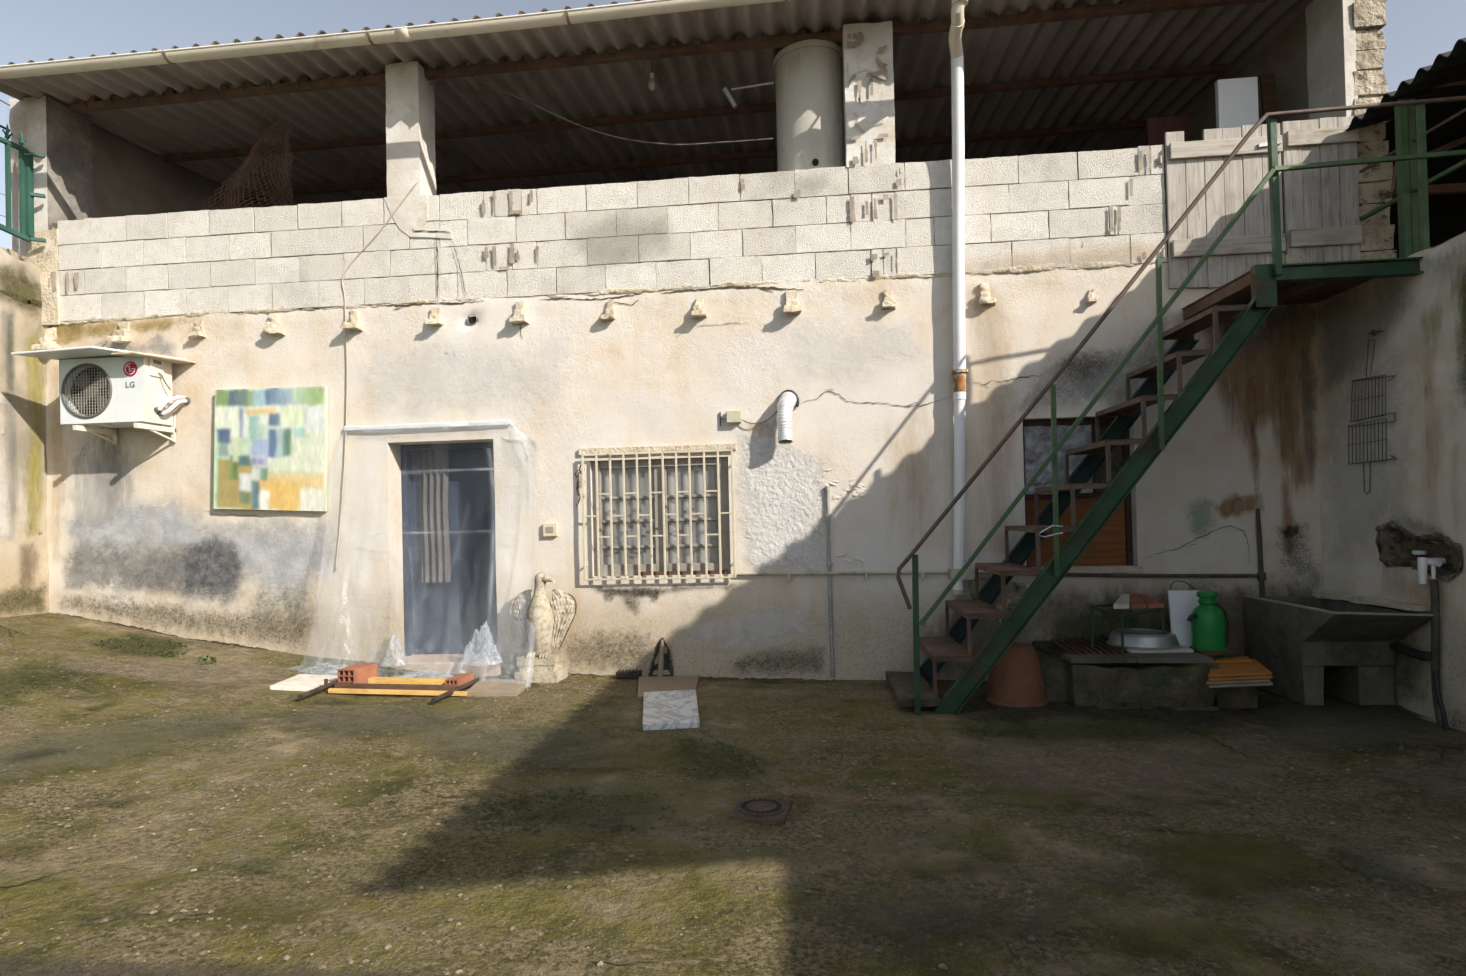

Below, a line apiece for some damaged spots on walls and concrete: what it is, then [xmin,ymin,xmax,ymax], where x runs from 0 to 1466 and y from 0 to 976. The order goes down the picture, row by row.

crack [804,375,1042,407]
rust [1220,314,1315,554]
leakage [68,450,329,643]
spalling [1375,520,1462,582]
leakage [597,586,693,611]